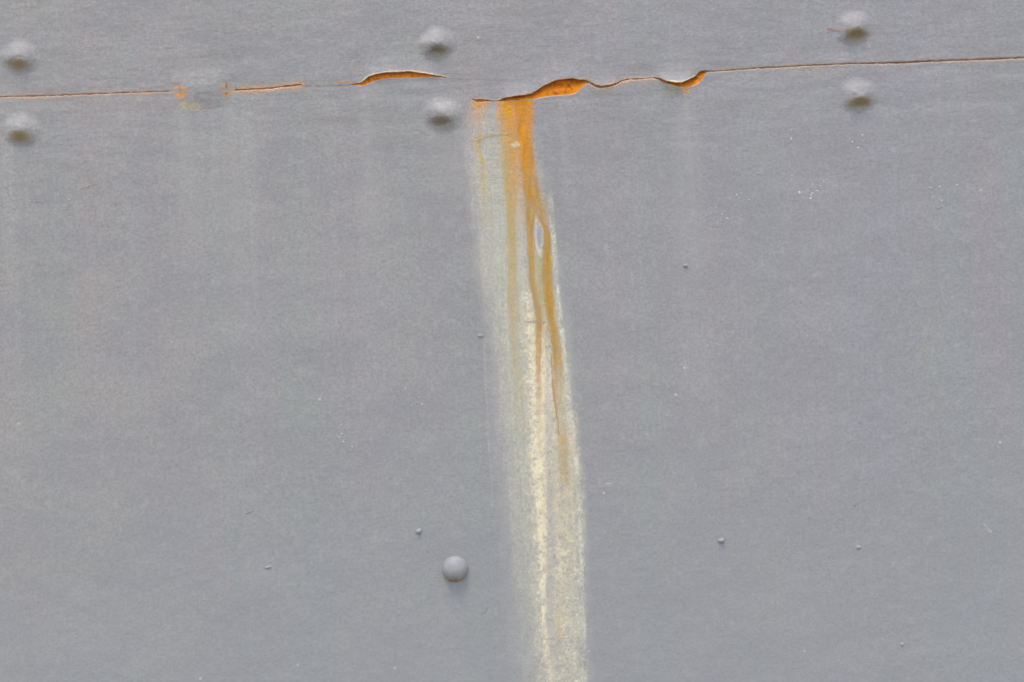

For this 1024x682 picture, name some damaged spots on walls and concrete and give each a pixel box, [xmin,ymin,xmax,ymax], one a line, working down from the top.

crack [706,57,1024,73]
crack [236,80,354,92]
crack [588,77,659,88]
crack [0,90,168,98]
rust [472,99,586,682]